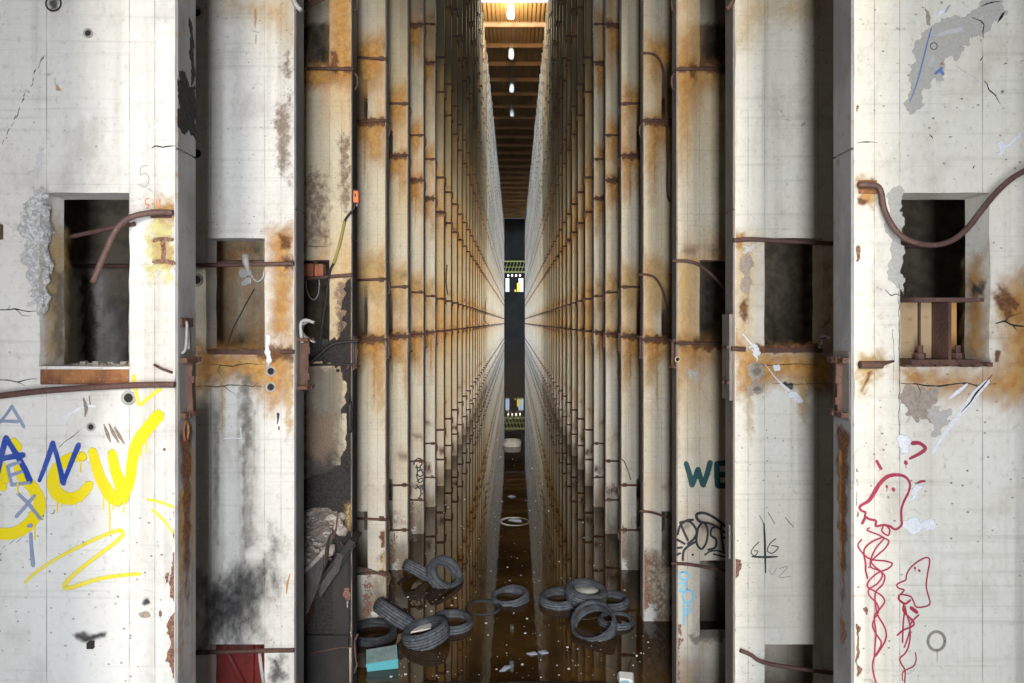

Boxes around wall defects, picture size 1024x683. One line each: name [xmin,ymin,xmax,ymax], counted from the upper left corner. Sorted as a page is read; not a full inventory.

flaking render [904,0,1008,115]
corrosion [595,55,725,218]
spalling [17,186,49,316]
corrosion [196,229,294,425]
corrosion [595,330,722,370]
corrosion [649,263,691,331]
flaking render [739,244,755,295]
corrosion [737,342,833,413]
flaking render [884,186,905,296]
flaking render [899,383,952,437]
corrosion [908,280,1024,401]
corrosion [837,427,850,574]